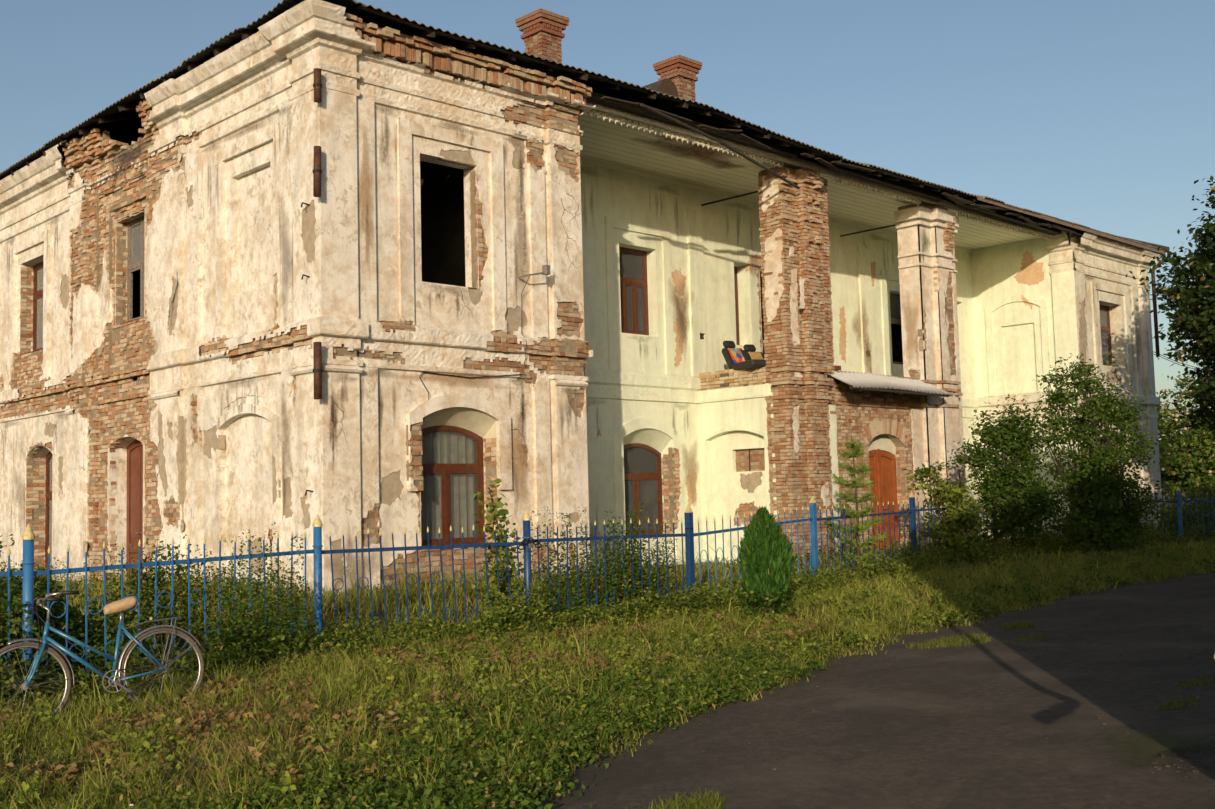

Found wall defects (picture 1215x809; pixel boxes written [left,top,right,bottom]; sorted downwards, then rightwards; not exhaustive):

spalling [0,131,225,584]
spalling [437,149,488,306]
damp [672,288,688,344]
spalling [734,167,920,561]
peeling [1013,246,1046,310]
spalling [361,422,507,591]